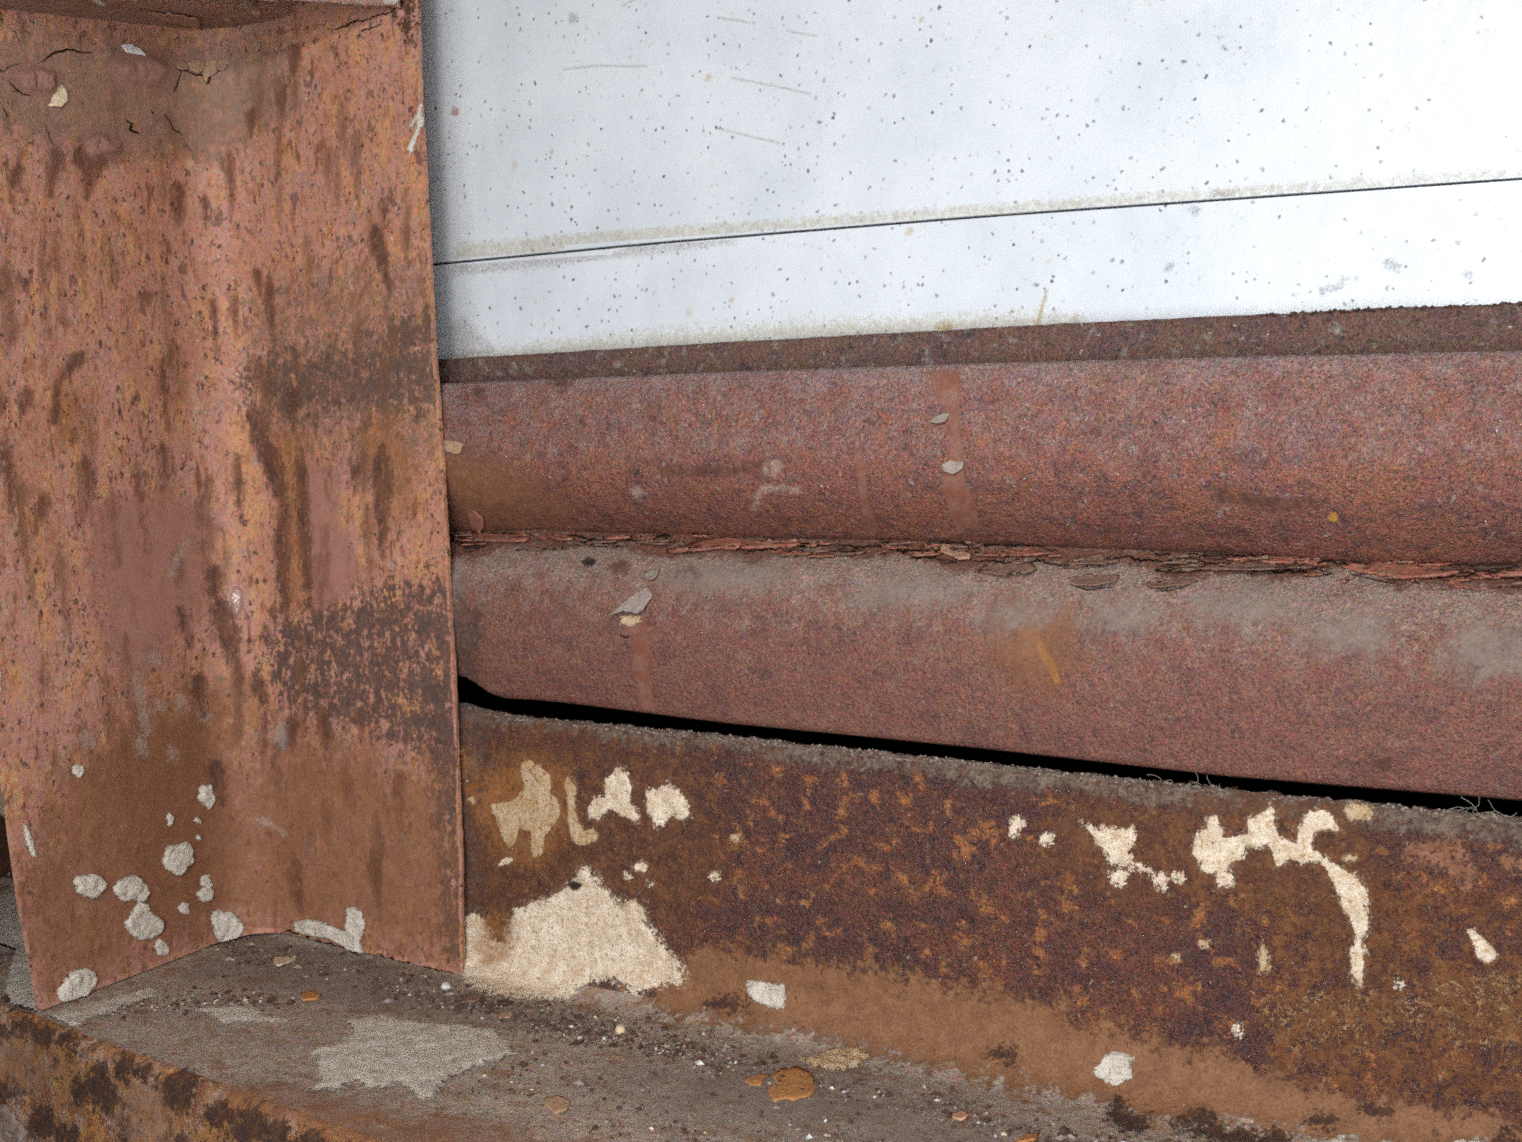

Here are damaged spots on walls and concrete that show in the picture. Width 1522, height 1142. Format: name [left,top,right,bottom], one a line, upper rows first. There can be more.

rust [247,45,300,133]
rust [46,148,108,200]
rust [370,209,409,289]
peeling [582,557,659,627]
peeling [666,536,830,580]
peeling [906,543,971,560]
peeling [1340,561,1461,579]
rust [0,271,1522,1142]
peeling [1008,814,1056,847]
peeling [460,759,693,1019]
peeling [1081,799,1376,990]
peeling [273,956,298,967]